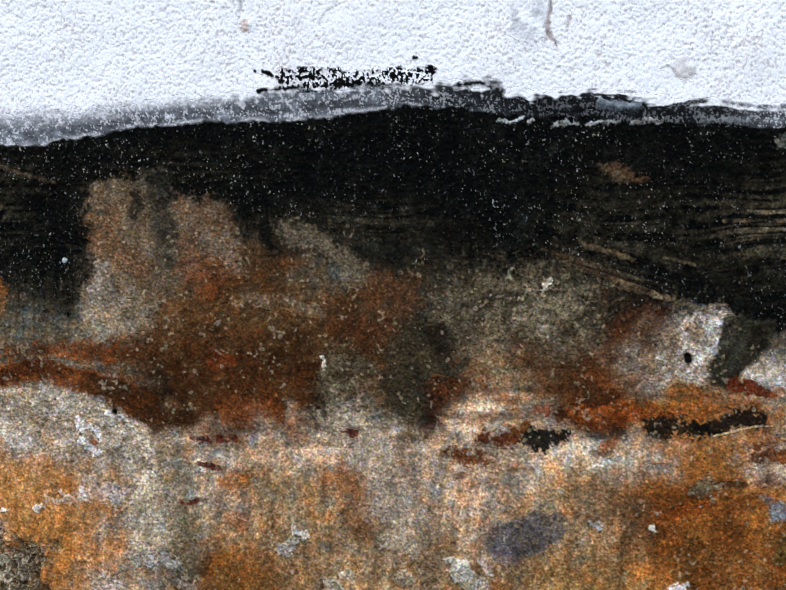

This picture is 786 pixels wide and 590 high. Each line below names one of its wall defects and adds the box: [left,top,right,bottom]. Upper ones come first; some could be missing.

damp [124,163,183,273]
corrosion [0,264,426,453]
corrosion [425,300,786,575]
corrosion [0,454,137,583]
corrosion [186,551,332,590]
corrosion [311,456,382,547]
corrosion [485,575,519,590]